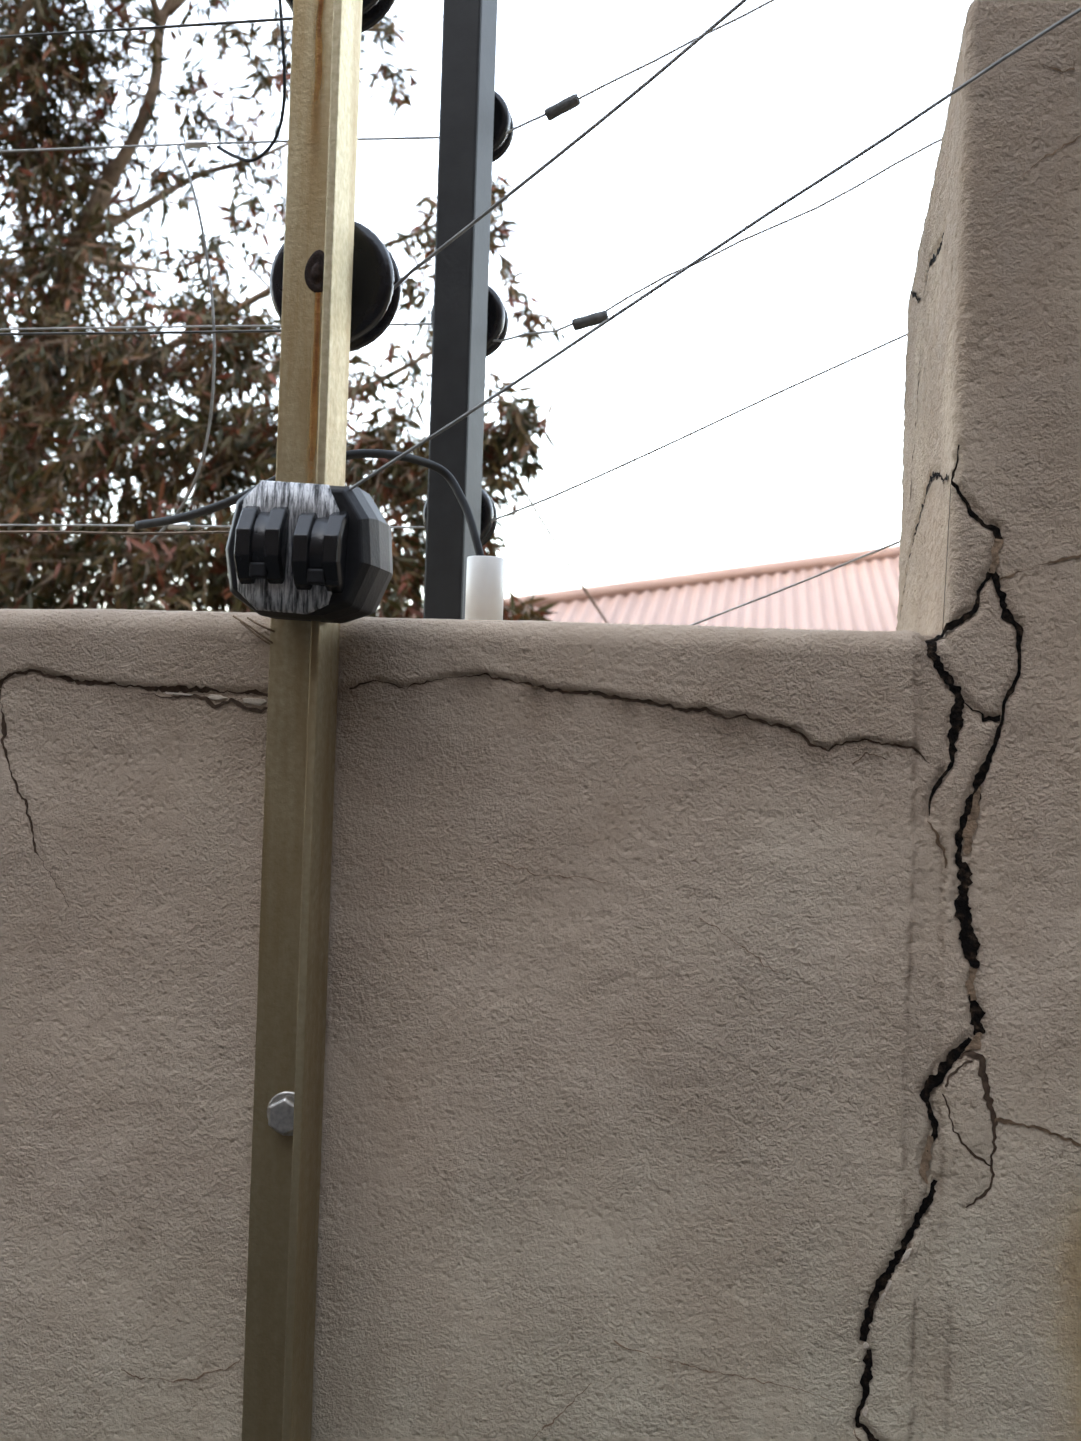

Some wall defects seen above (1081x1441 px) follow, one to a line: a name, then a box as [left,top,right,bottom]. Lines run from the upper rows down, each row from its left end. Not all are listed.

crack [0,669,268,906]
crack [349,322,1081,1441]